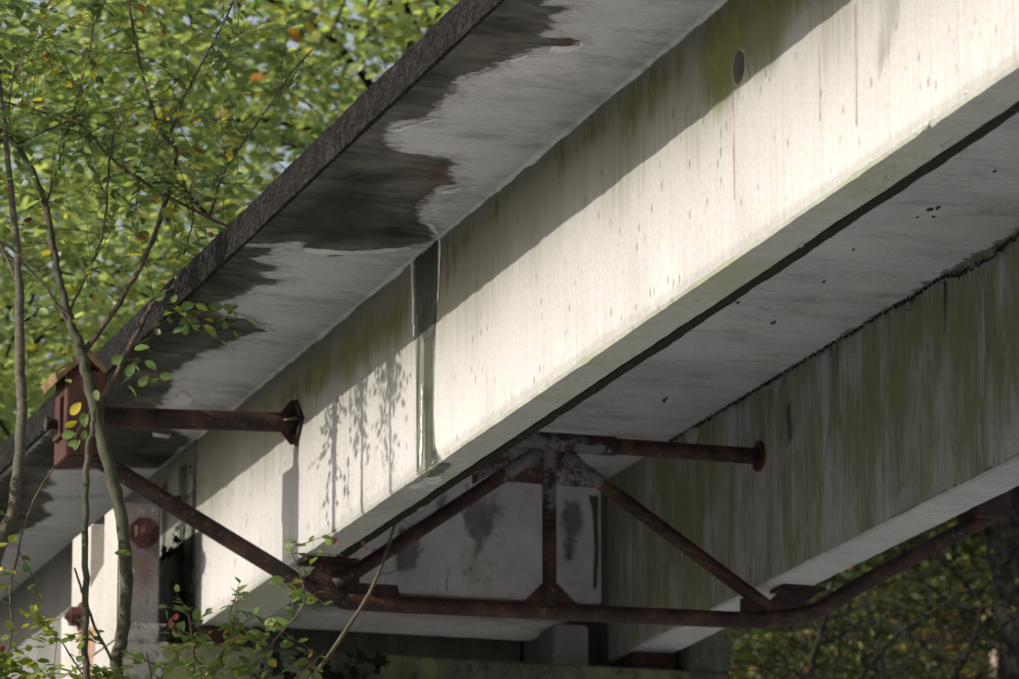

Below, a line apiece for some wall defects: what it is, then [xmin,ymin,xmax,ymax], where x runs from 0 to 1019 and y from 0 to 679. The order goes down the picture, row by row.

leakage [105,0,592,489]
leakage [0,429,97,547]
leakage [105,427,194,507]
leakage [160,508,193,643]
leakage [466,503,497,552]
leakage [563,503,581,560]
leakage [725,399,750,447]
leakage [813,349,831,464]